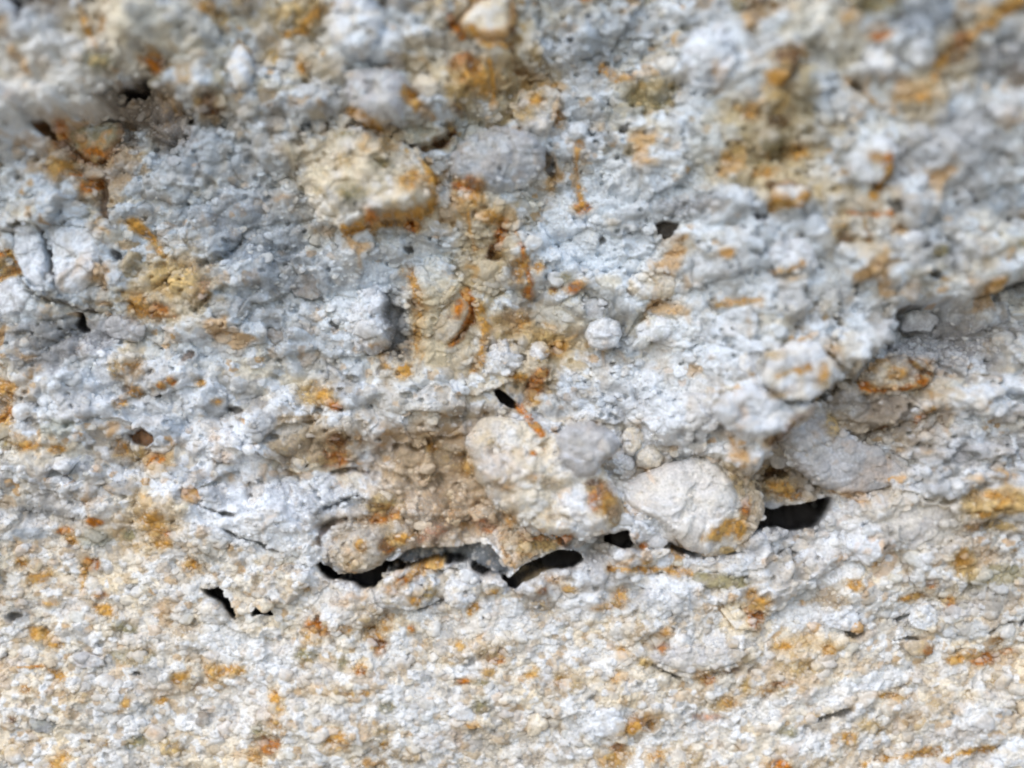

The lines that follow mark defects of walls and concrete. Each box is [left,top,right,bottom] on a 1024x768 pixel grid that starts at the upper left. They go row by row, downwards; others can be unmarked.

corrosion [572,185,591,214]
corrosion [336,160,546,301]
corrosion [402,269,423,349]
corrosion [447,286,569,372]
corrosion [395,363,413,381]
corrosion [856,358,934,395]
corrosion [278,380,342,422]
corrosion [510,368,550,438]
crack [319,542,583,588]